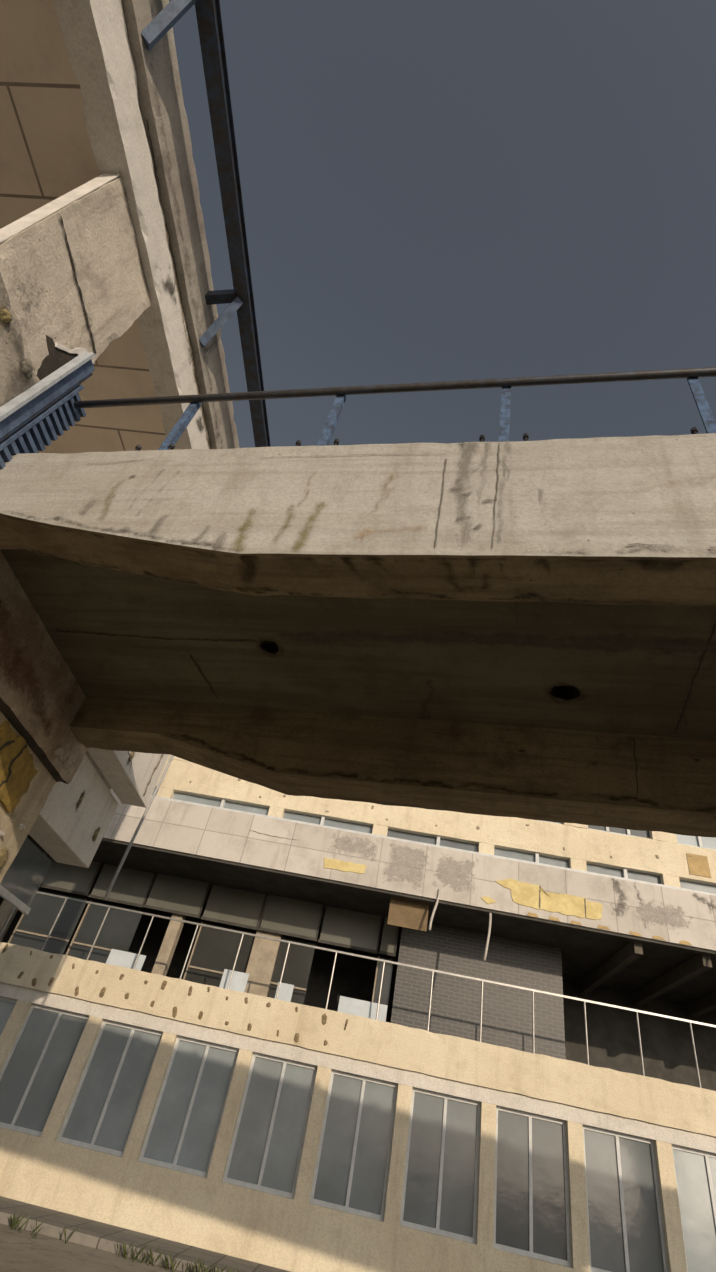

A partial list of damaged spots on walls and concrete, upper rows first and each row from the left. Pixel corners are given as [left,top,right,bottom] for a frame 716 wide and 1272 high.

peeling [384,845,474,891]
peeling [630,903,692,946]